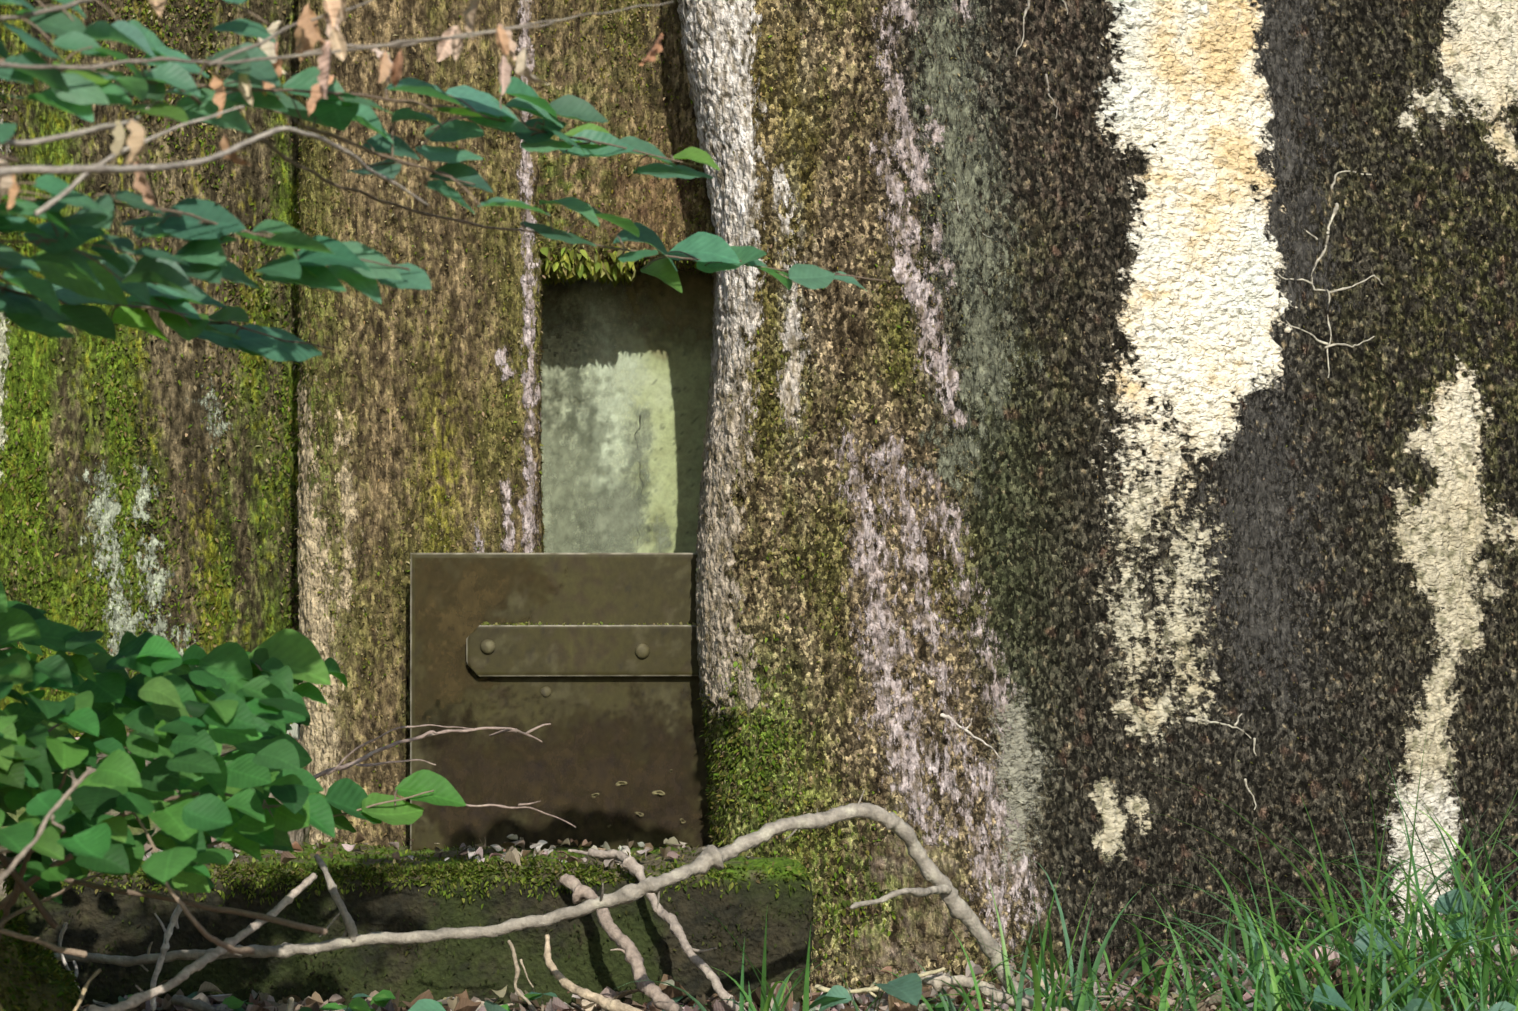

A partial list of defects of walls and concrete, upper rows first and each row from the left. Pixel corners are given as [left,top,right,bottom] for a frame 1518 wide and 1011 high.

water stain [0,312,10,450]
water stain [198,378,230,449]
water stain [76,461,199,672]